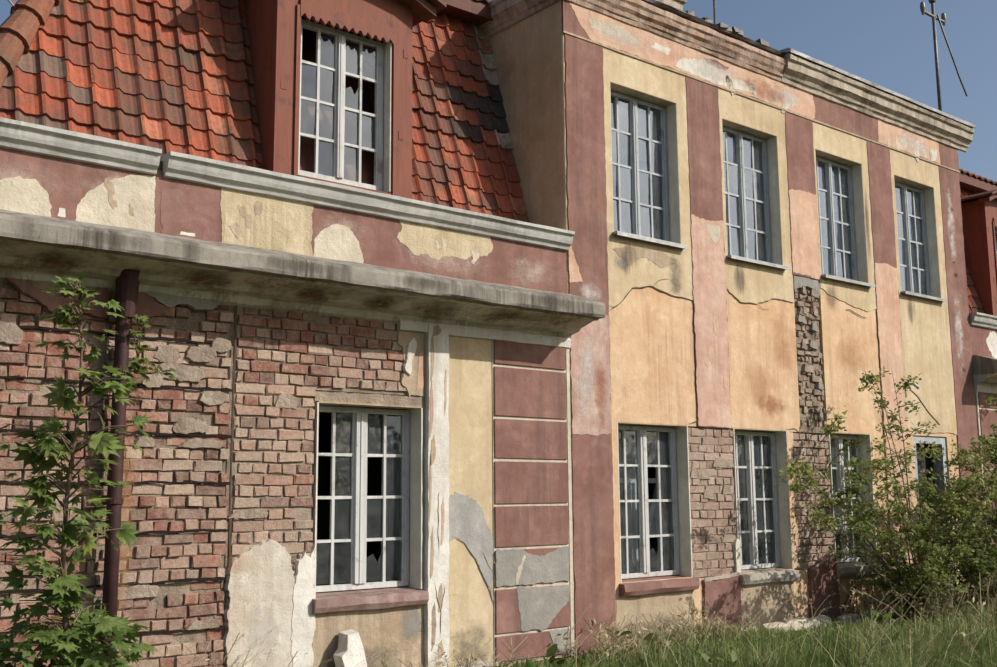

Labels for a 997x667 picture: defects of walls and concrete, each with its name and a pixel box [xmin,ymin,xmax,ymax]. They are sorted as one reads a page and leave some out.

peeling [569,2,815,119]
flaking render [0,175,364,263]
flaking render [397,220,493,264]
crack [611,279,691,309]
peeling [986,331,997,358]
flaking render [115,305,447,667]
flaking render [495,546,571,654]